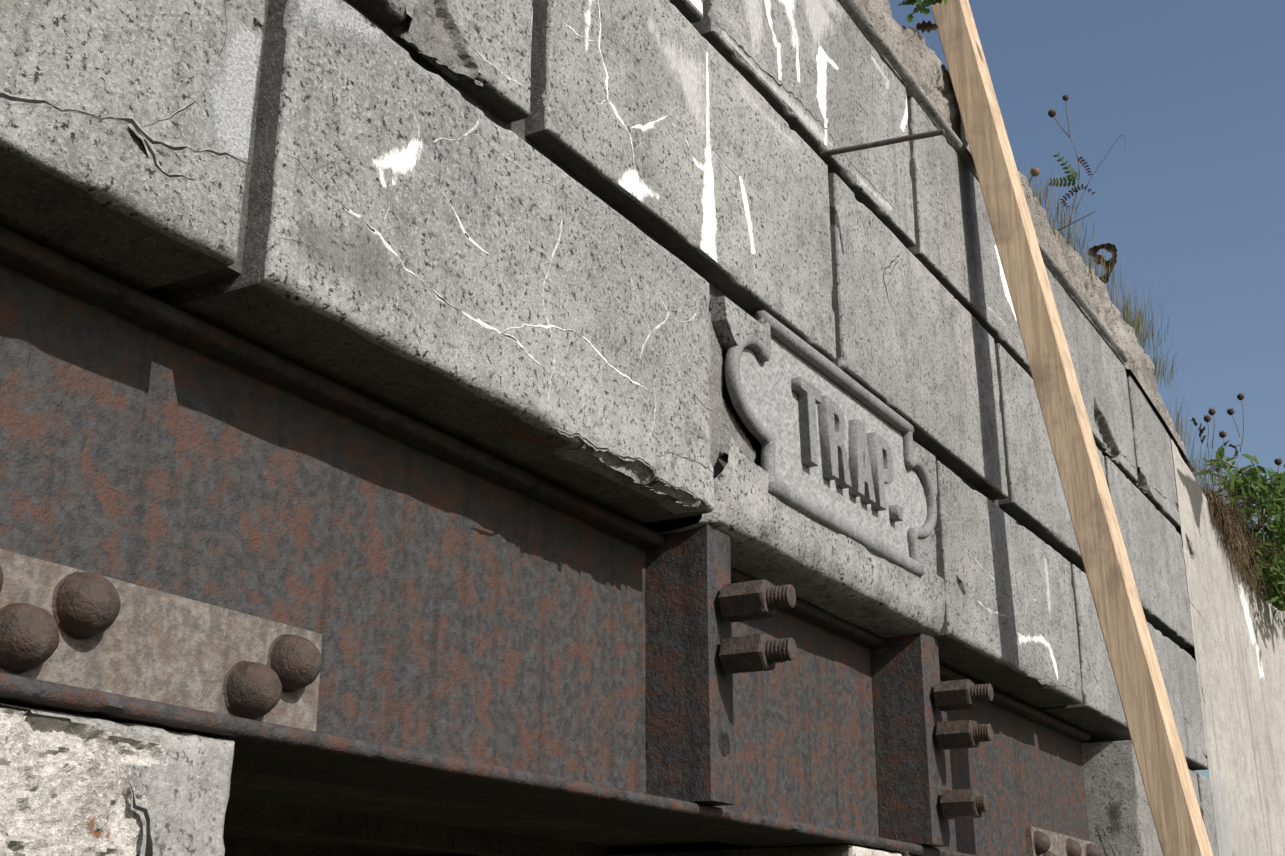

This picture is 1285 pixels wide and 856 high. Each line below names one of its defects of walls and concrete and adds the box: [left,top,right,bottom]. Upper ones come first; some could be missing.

crack [217,0,227,63]
peeling [295,0,382,66]
spalling [400,0,487,86]
crack [471,47,523,87]
leakage [584,0,592,50]
leakage [724,0,840,146]
crack [0,90,251,180]
crack [551,1,756,291]
leakage [739,176,755,255]
leakage [856,175,892,211]
crack [286,92,716,506]
spalling [0,708,179,856]